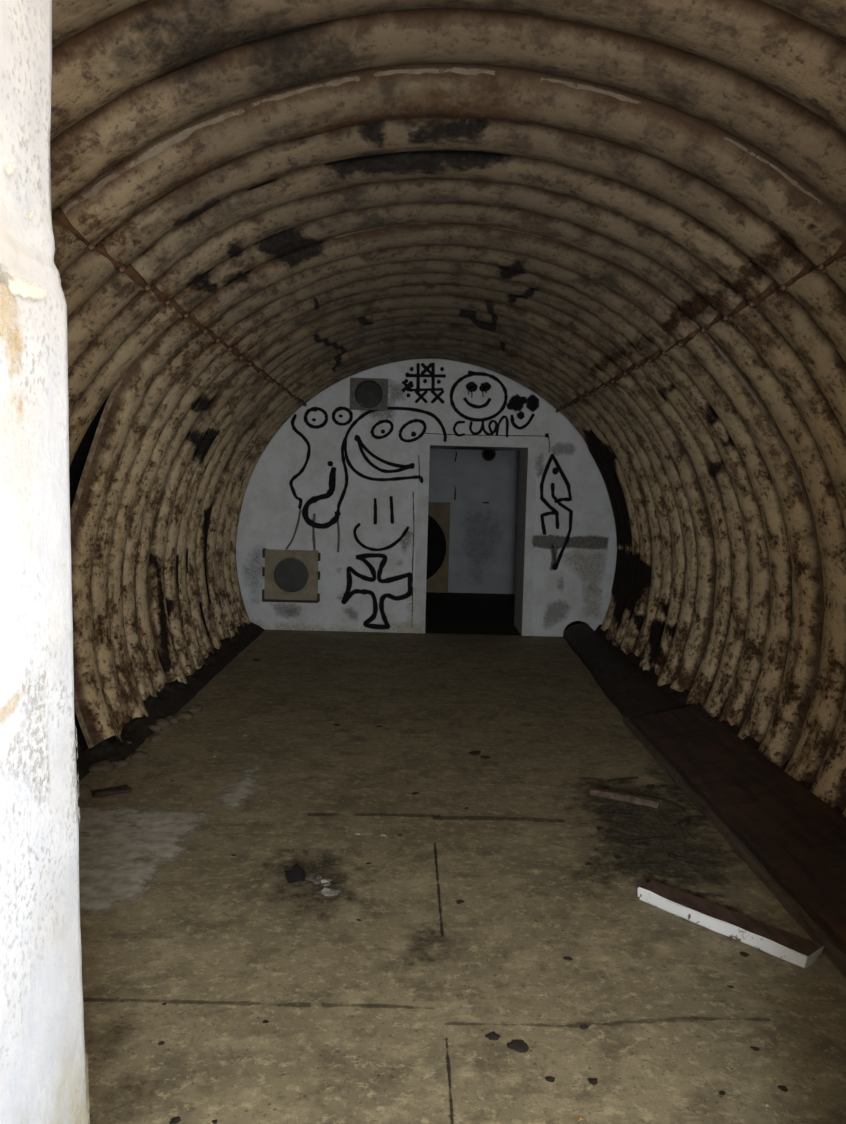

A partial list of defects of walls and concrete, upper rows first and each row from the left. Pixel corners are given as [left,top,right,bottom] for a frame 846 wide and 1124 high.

peeling [374,67,495,76]
peeling [540,78,639,104]
peeling [63,76,360,213]
peeling [724,137,823,206]